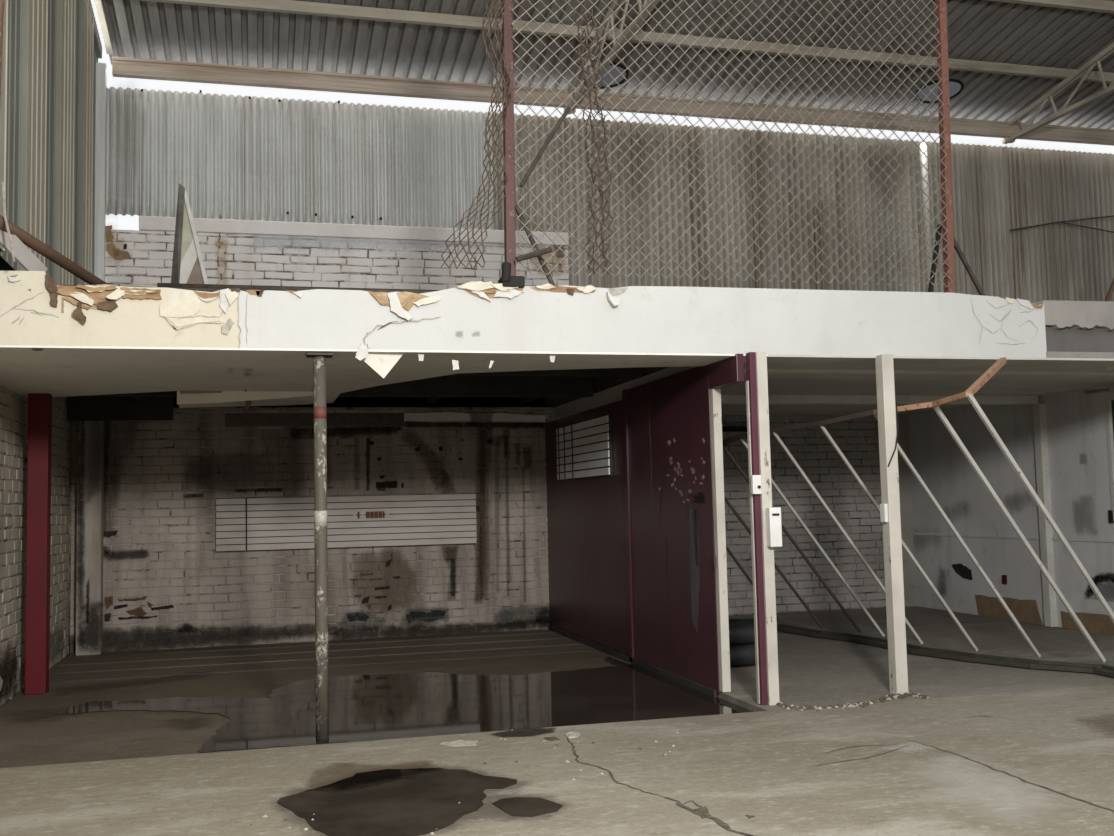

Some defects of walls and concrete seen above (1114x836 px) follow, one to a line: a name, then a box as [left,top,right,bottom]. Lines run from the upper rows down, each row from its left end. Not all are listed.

spalling [45,272,264,335]
spalling [368,291,442,321]
peeling [355,343,370,361]
leakage [49,421,550,661]
leakage [1085,574,1114,597]
leakage [0,647,25,698]
crack [567,738,754,836]
crack [814,740,1114,811]